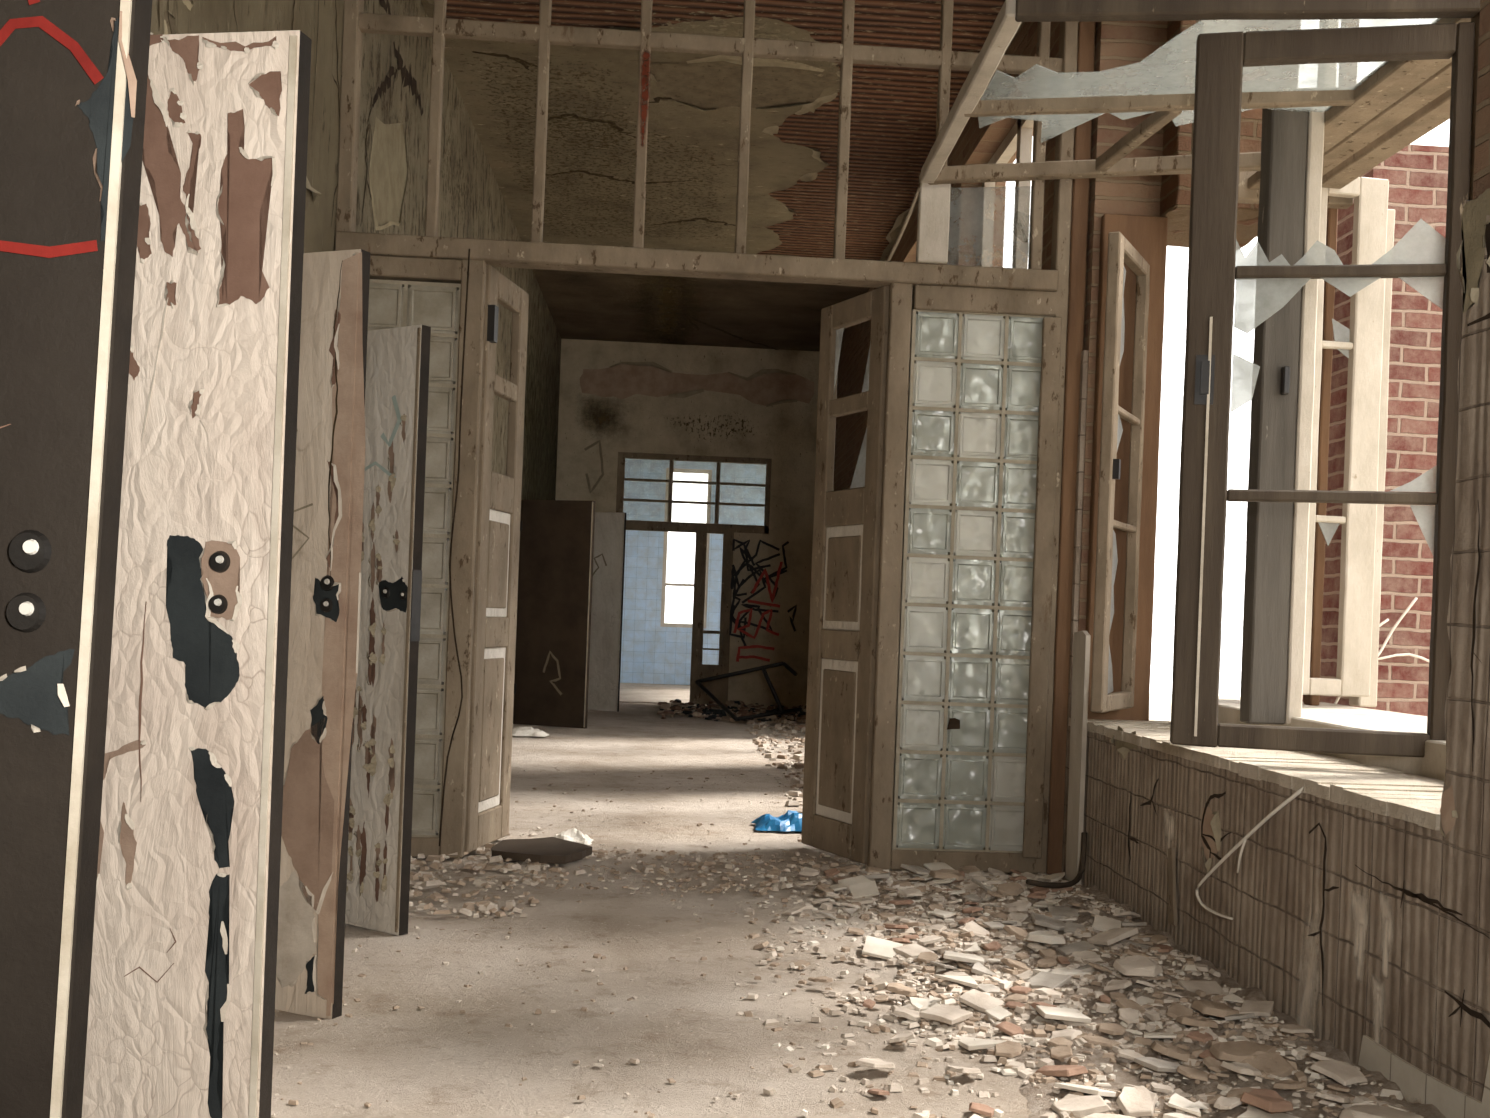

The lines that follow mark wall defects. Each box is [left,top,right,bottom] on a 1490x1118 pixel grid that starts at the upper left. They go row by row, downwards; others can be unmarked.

peeling [650,55,840,111]
flaking render [579,362,814,442]
crack [1128,778,1159,872]
crack [1201,791,1232,860]
crack [1307,823,1490,1006]
crack [1445,990,1490,1028]